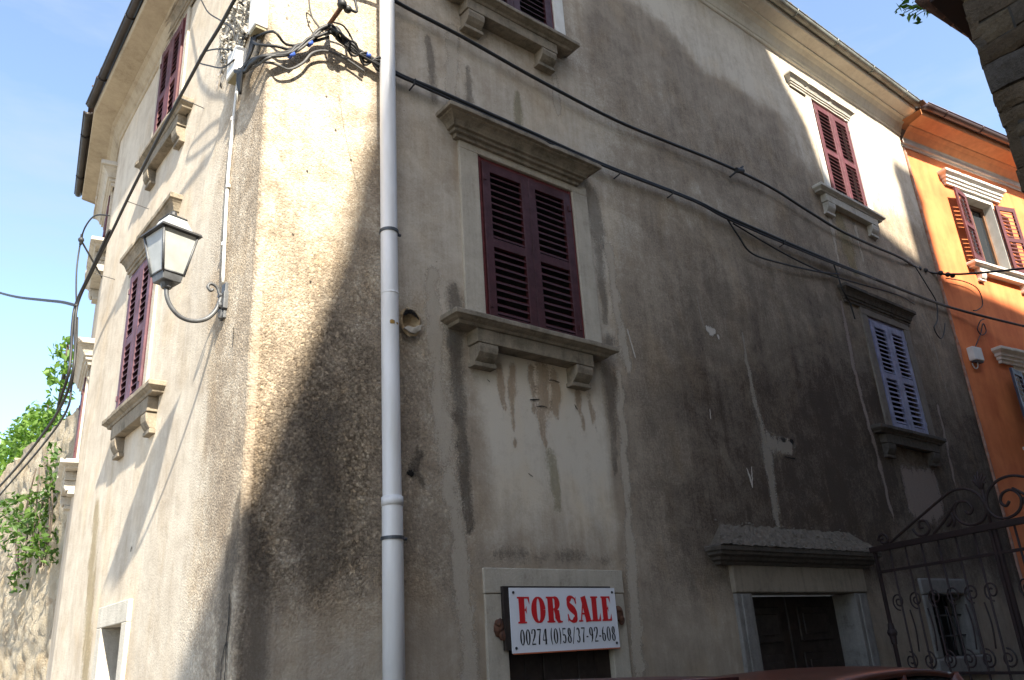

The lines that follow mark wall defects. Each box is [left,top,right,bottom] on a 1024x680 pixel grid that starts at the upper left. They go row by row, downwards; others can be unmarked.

water stain [424,266,480,680]